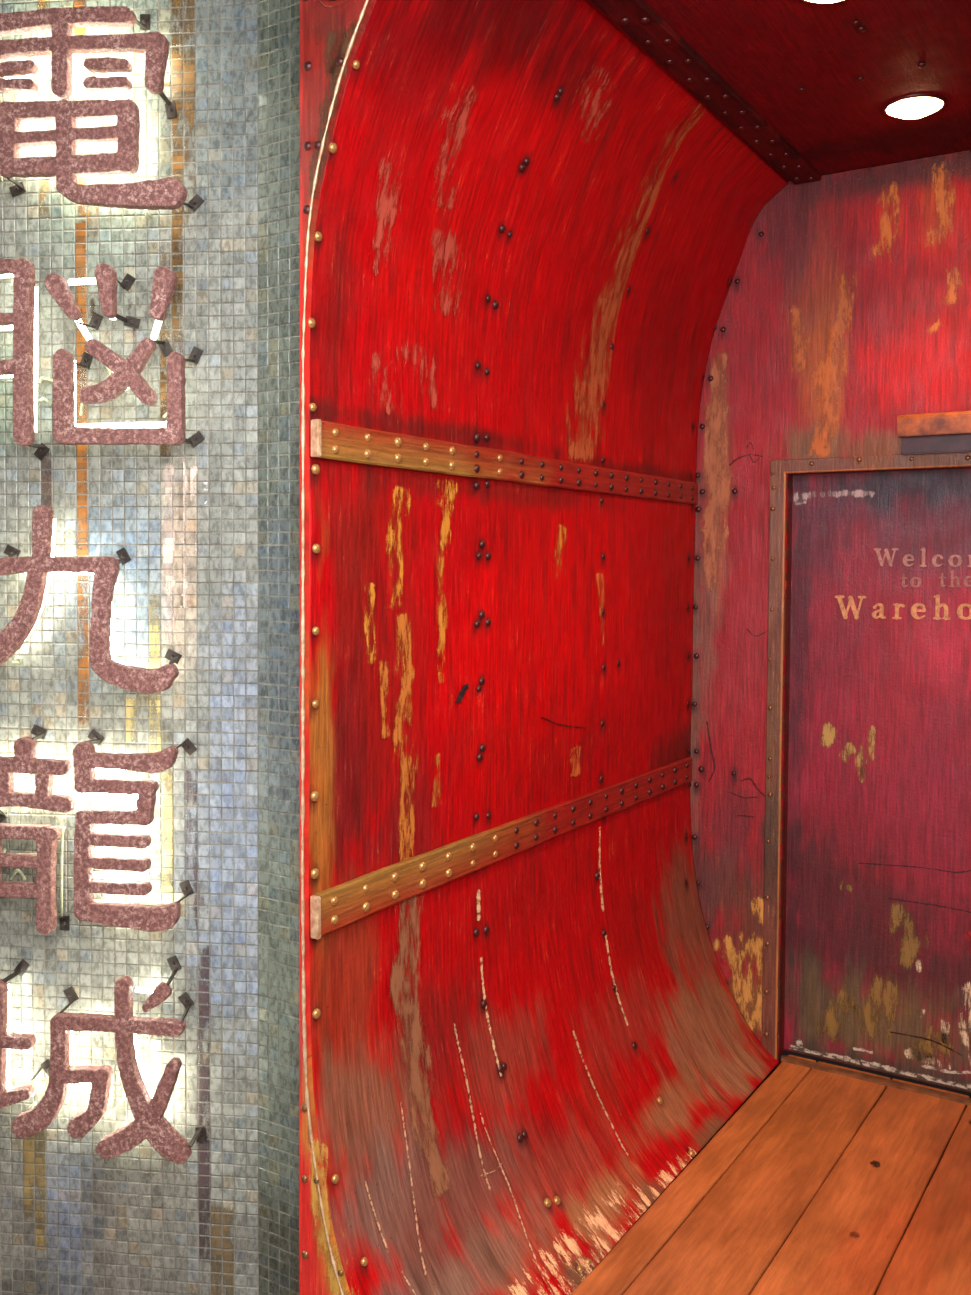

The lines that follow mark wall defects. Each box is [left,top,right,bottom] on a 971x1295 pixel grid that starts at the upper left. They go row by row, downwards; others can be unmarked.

rust [165,0,195,190]
rust [75,205,98,424]
rust [160,205,188,421]
peeling [869,182,902,255]
peeling [925,164,955,244]
peeling [945,267,960,304]
rust [77,445,88,558]
rust [78,574,89,724]
peeling [821,722,876,783]
peeling [817,903,971,1070]
peeling [508,1147,696,1295]